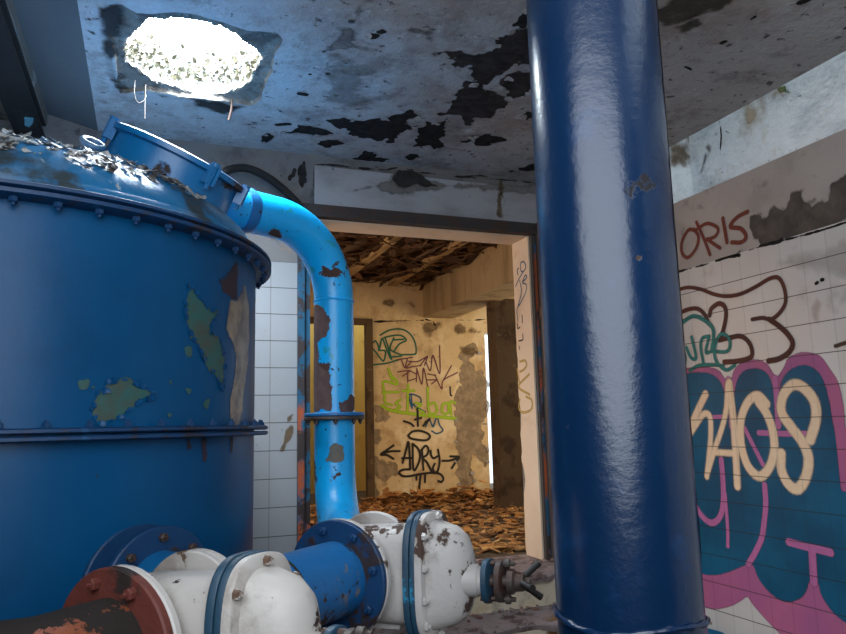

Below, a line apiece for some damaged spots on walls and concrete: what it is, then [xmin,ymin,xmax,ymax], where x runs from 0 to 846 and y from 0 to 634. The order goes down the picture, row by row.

spalling [261,8,531,163]
peeling [288,161,314,187]
flaking render [453,343,490,491]